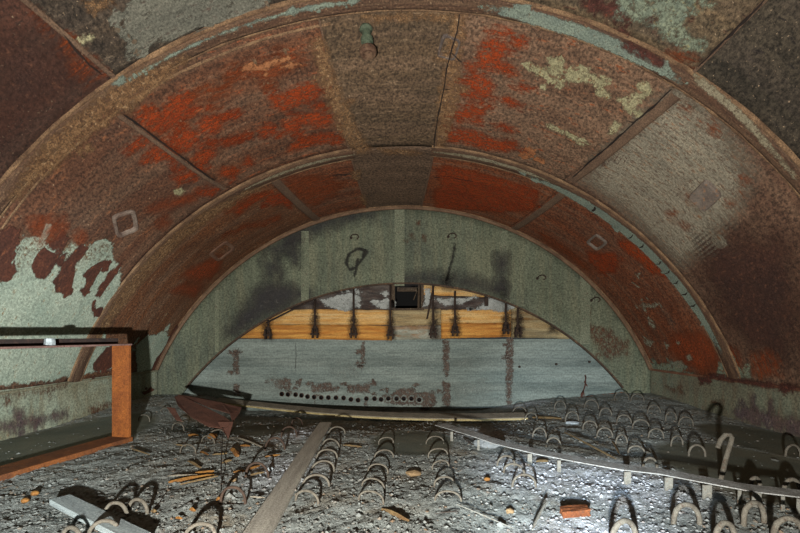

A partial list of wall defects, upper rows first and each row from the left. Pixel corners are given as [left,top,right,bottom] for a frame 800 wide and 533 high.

rust [60,35,105,81]
rust [121,68,345,197]
peeling [245,36,422,190]
crack [433,14,462,147]
rust [440,24,538,153]
peeling [361,0,796,351]
peeling [0,224,121,386]
damp [228,213,372,333]
rust [618,240,666,278]